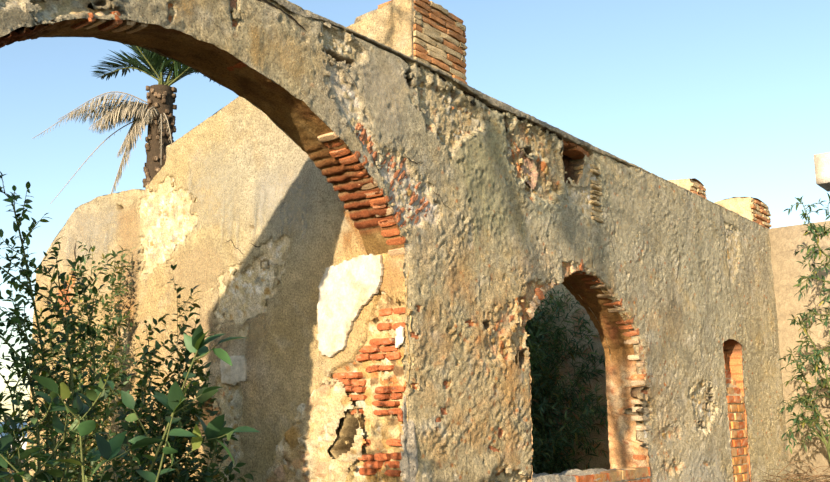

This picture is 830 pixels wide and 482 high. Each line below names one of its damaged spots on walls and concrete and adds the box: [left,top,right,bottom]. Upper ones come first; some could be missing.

spalling [0,0,119,27]
spalling [319,21,443,239]
spalling [409,64,489,158]
spalling [501,111,604,227]
spalling [211,235,293,340]
flaking render [317,254,424,482]
spalling [484,261,648,381]
spalling [488,427,526,482]